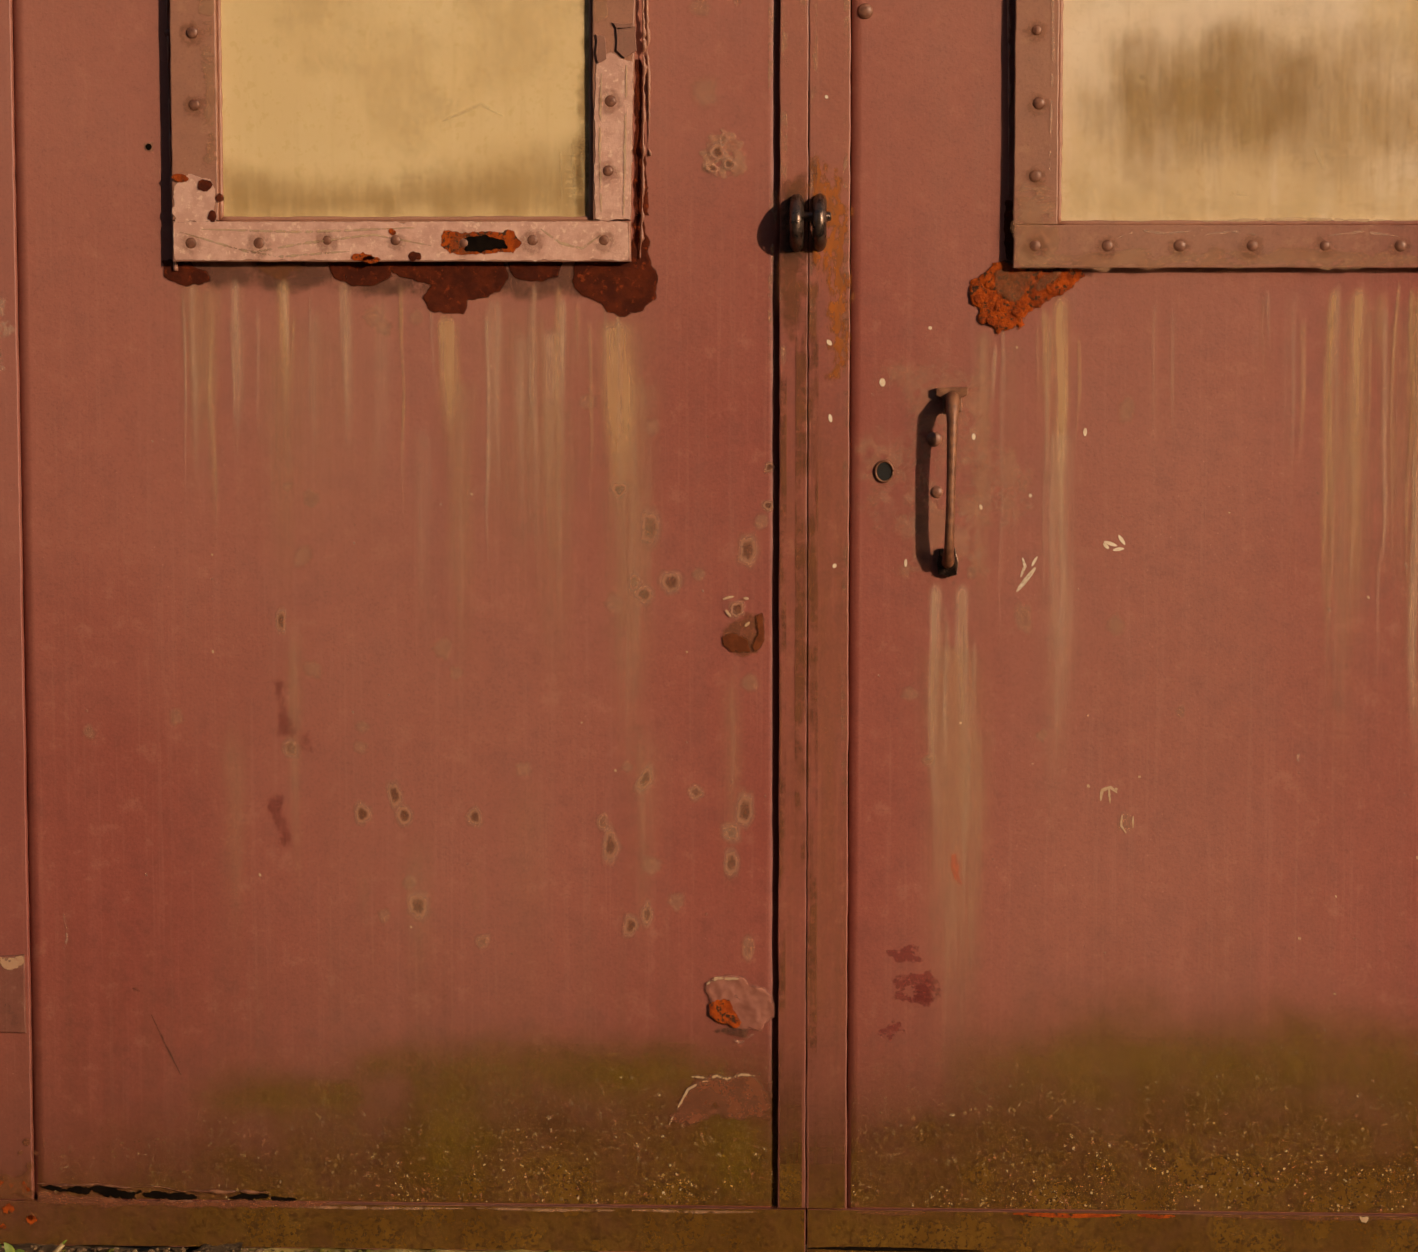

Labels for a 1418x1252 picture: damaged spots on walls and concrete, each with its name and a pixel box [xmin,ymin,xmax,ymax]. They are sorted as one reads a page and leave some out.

peeling [145,0,652,271]
rust [172,174,224,222]
rust [328,59,658,317]
rust [162,259,210,287]
rust [257,262,304,279]
rust [969,200,1085,335]
rust [780,158,854,743]
rust [722,616,758,655]
peeling [705,975,776,1031]
peeling [669,1073,771,1125]